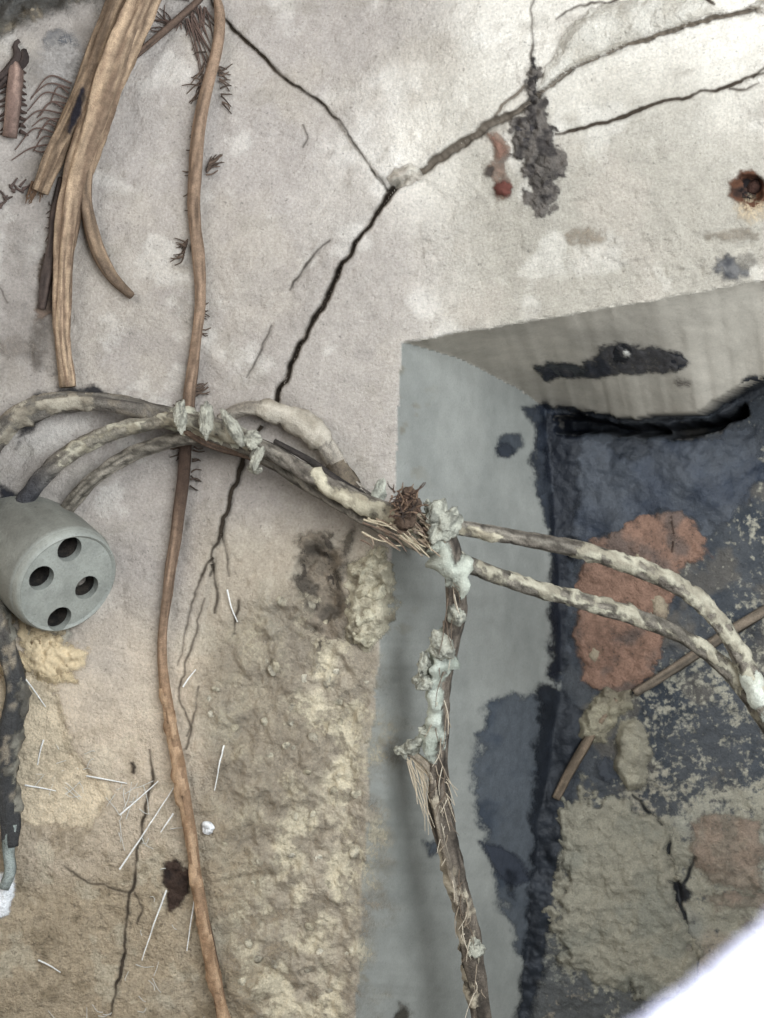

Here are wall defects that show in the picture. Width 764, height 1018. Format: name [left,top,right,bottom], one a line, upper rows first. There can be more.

crack [211,0,399,402]
rust [485,132,513,200]
water stain [509,57,568,218]
crack [420,0,764,174]
rust [729,170,764,219]
crack [178,458,245,749]
crack [67,749,155,1017]